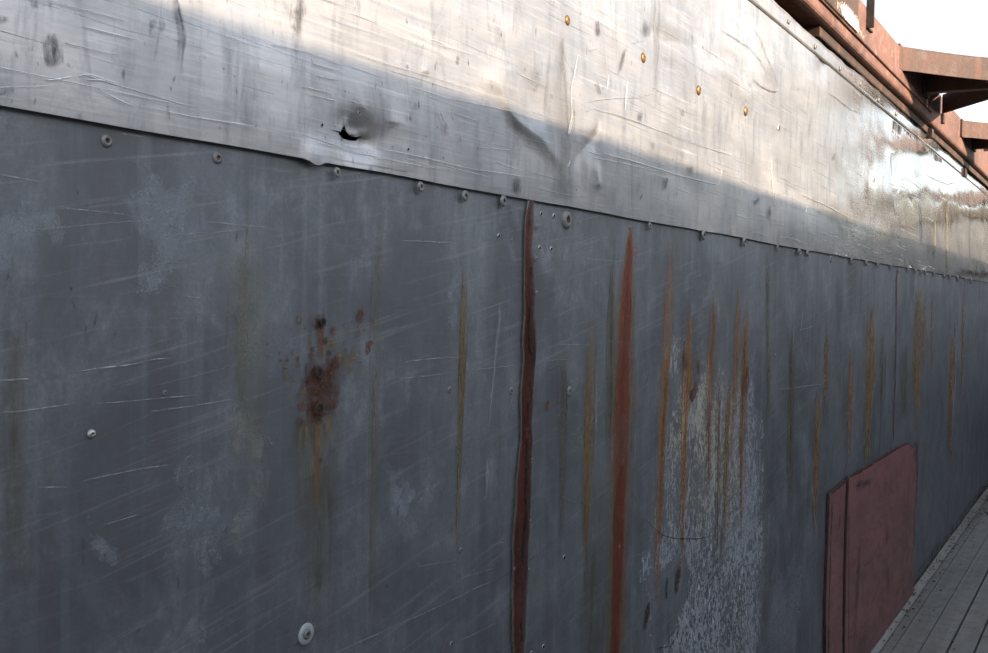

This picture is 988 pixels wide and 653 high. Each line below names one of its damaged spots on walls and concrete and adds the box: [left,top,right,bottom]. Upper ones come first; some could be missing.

corrosion [280,318,355,489]
corrosion [610,238,637,653]
corrosion [681,335,749,497]